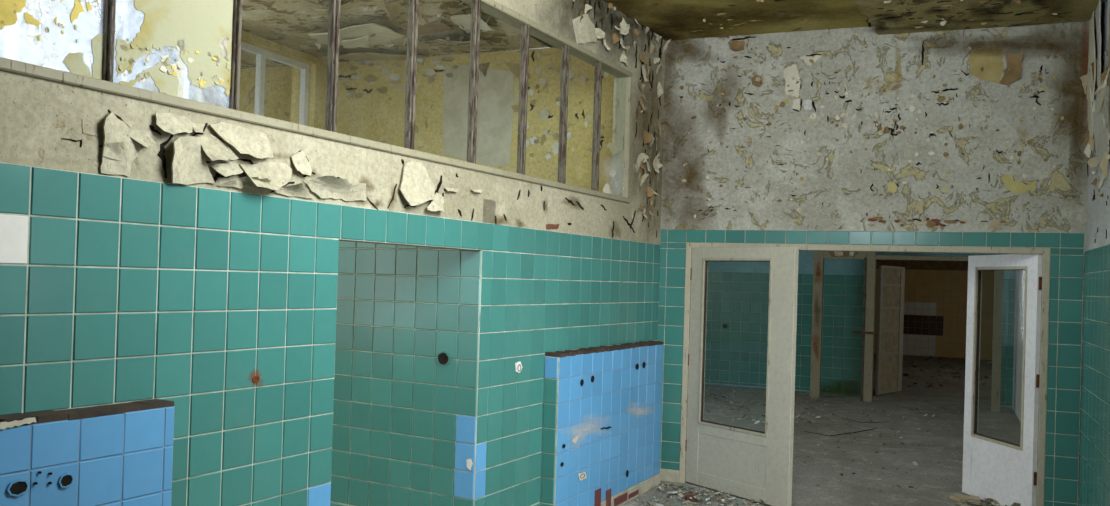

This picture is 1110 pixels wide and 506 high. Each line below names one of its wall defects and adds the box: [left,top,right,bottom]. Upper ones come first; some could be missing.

peeling [0,0,233,97]
peeling [82,112,483,221]
peeling [308,0,588,167]
peeling [572,0,671,238]
damp [653,16,702,163]
damp [678,159,698,190]
peeling [682,5,1023,229]
peeling [877,0,1058,28]
peeling [975,129,1070,203]
peeling [1018,65,1064,124]
damp [1058,47,1088,157]